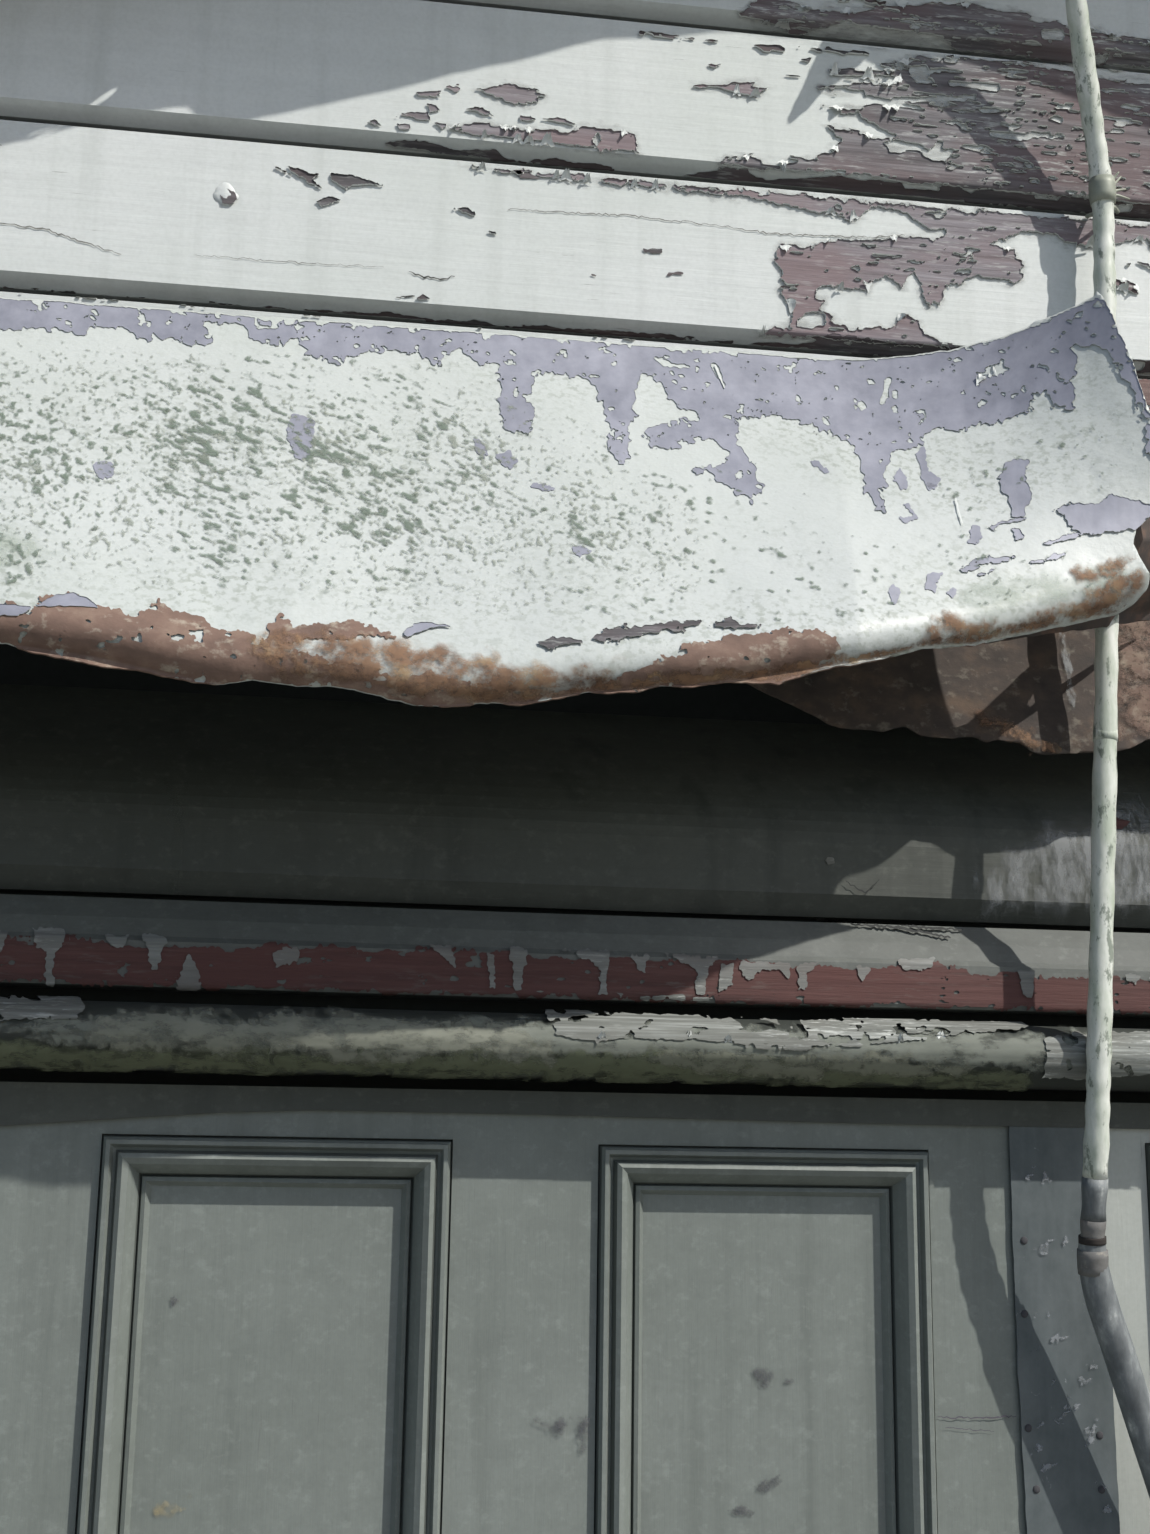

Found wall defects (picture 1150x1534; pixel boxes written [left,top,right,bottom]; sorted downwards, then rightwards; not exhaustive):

peeling [0,0,1150,523]
peeling [925,459,1150,598]
peeling [0,592,98,616]
peeling [404,622,450,637]
corrosion [0,559,1150,755]
peeling [538,616,762,649]
peeling [888,584,901,604]
peeling [0,934,1089,1083]
peeling [1110,975,1150,1077]